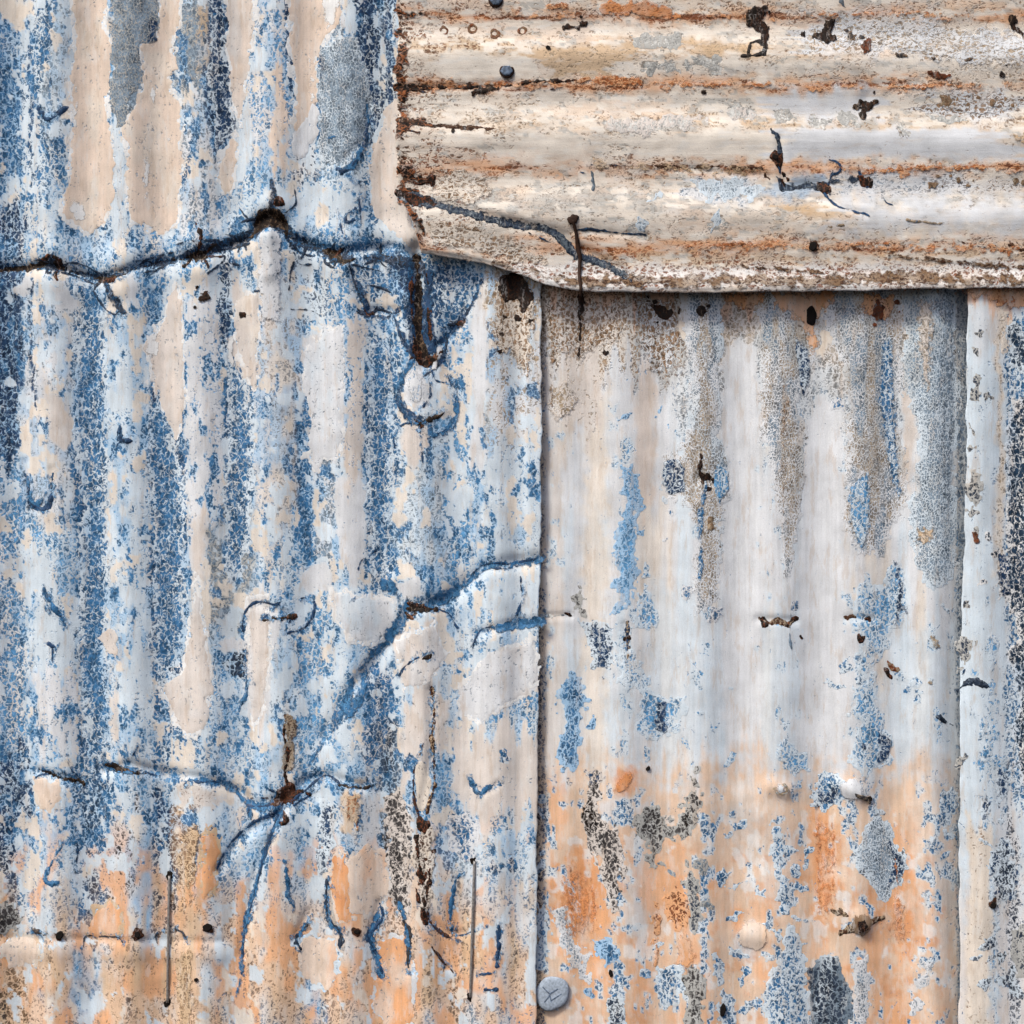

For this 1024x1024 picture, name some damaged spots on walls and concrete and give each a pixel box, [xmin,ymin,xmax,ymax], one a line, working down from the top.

peeling [58,0,186,237]
peeling [283,0,422,257]
rust [392,0,787,139]
rust [794,11,872,54]
rust [842,84,879,120]
rust [396,160,1024,377]
peeling [142,280,215,741]
peeling [659,292,733,623]
crack [336,778,379,794]
rust [412,816,436,925]
peeling [554,464,874,1024]
peeling [753,288,1024,1000]